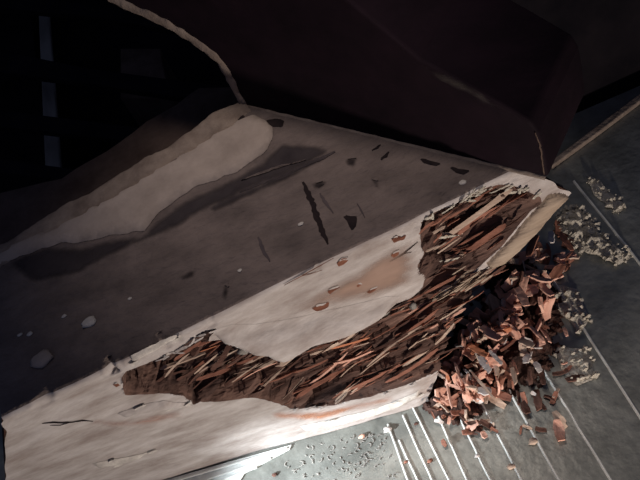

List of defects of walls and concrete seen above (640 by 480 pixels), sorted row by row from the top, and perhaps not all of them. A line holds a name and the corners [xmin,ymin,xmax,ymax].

damp [14,239,140,279]
damp [148,146,324,236]
crack [285,181,334,285]
spalling [114,184,542,431]
crack [42,419,93,427]